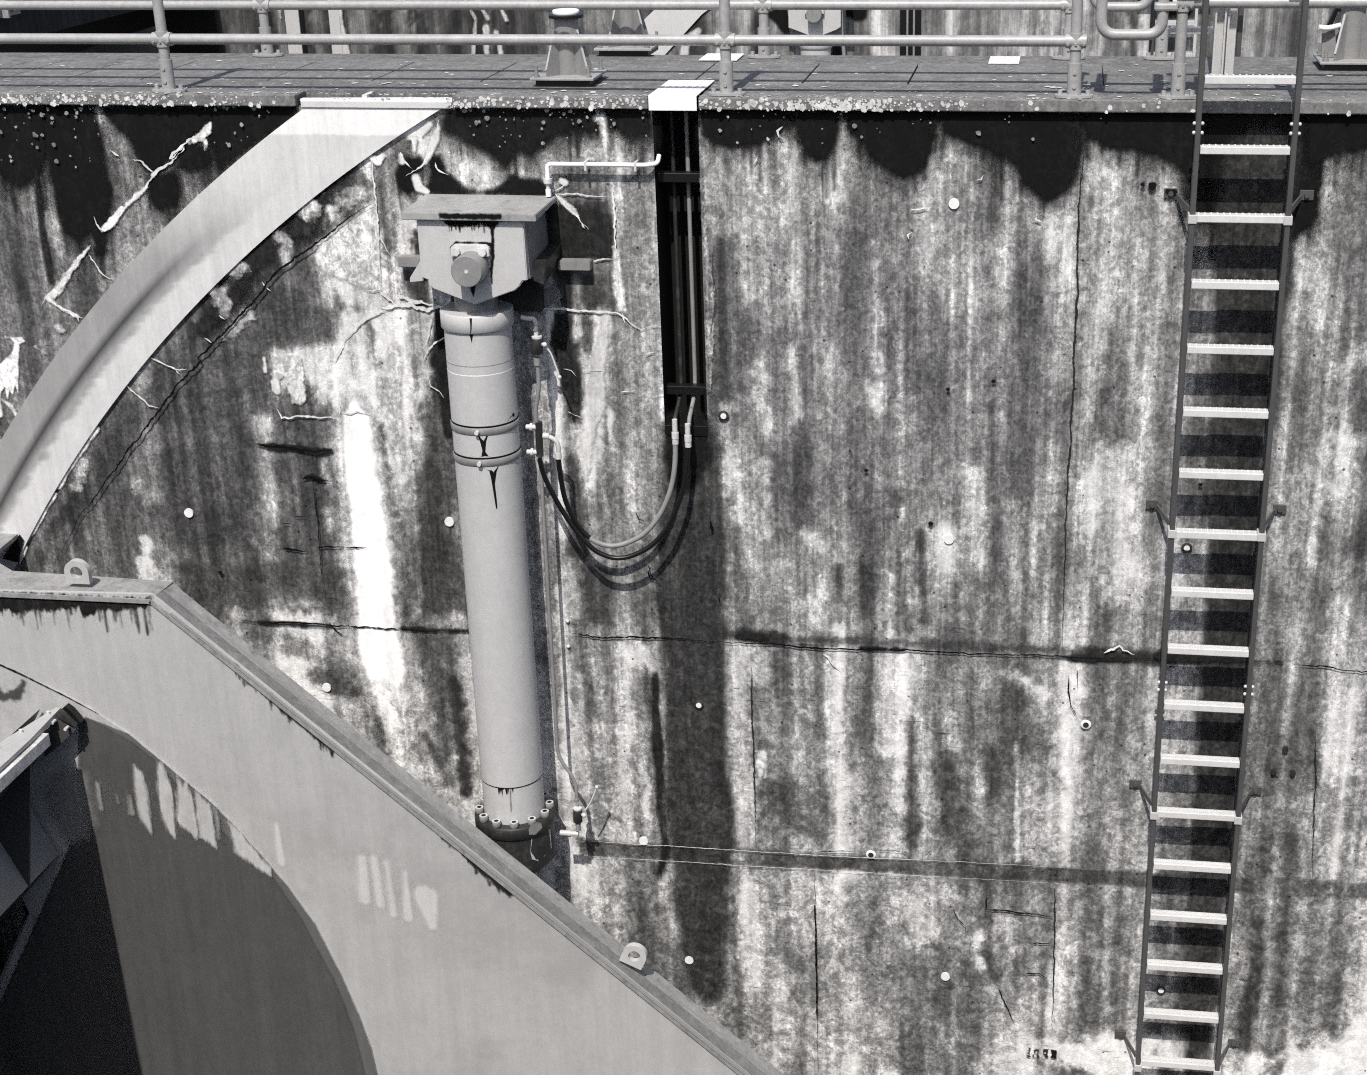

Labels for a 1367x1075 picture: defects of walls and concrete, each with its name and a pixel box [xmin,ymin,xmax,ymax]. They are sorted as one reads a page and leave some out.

spalling [0,336,47,417]
water stain [0,104,296,283]
crack [42,121,448,590]
water stain [431,313,453,439]
water stain [544,286,615,480]
crack [543,178,658,355]
water stain [19,427,99,564]
water stain [334,342,414,769]
crack [573,141,1367,1056]
water stain [698,108,1367,1075]
water stain [650,409,735,1001]